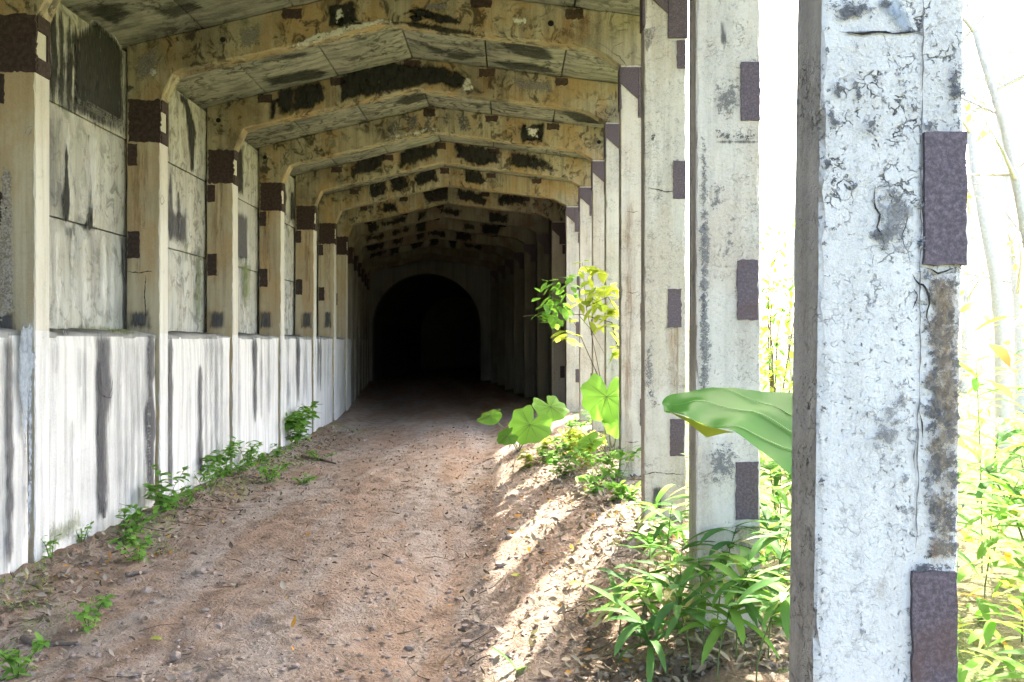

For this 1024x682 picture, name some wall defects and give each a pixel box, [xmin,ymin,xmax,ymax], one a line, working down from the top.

leakage [49,3,137,238]
leakage [160,177,187,241]
leakage [340,45,553,258]
crack [845,4,924,89]
leakage [0,313,36,562]
leakage [85,336,121,515]
leakage [131,312,173,500]